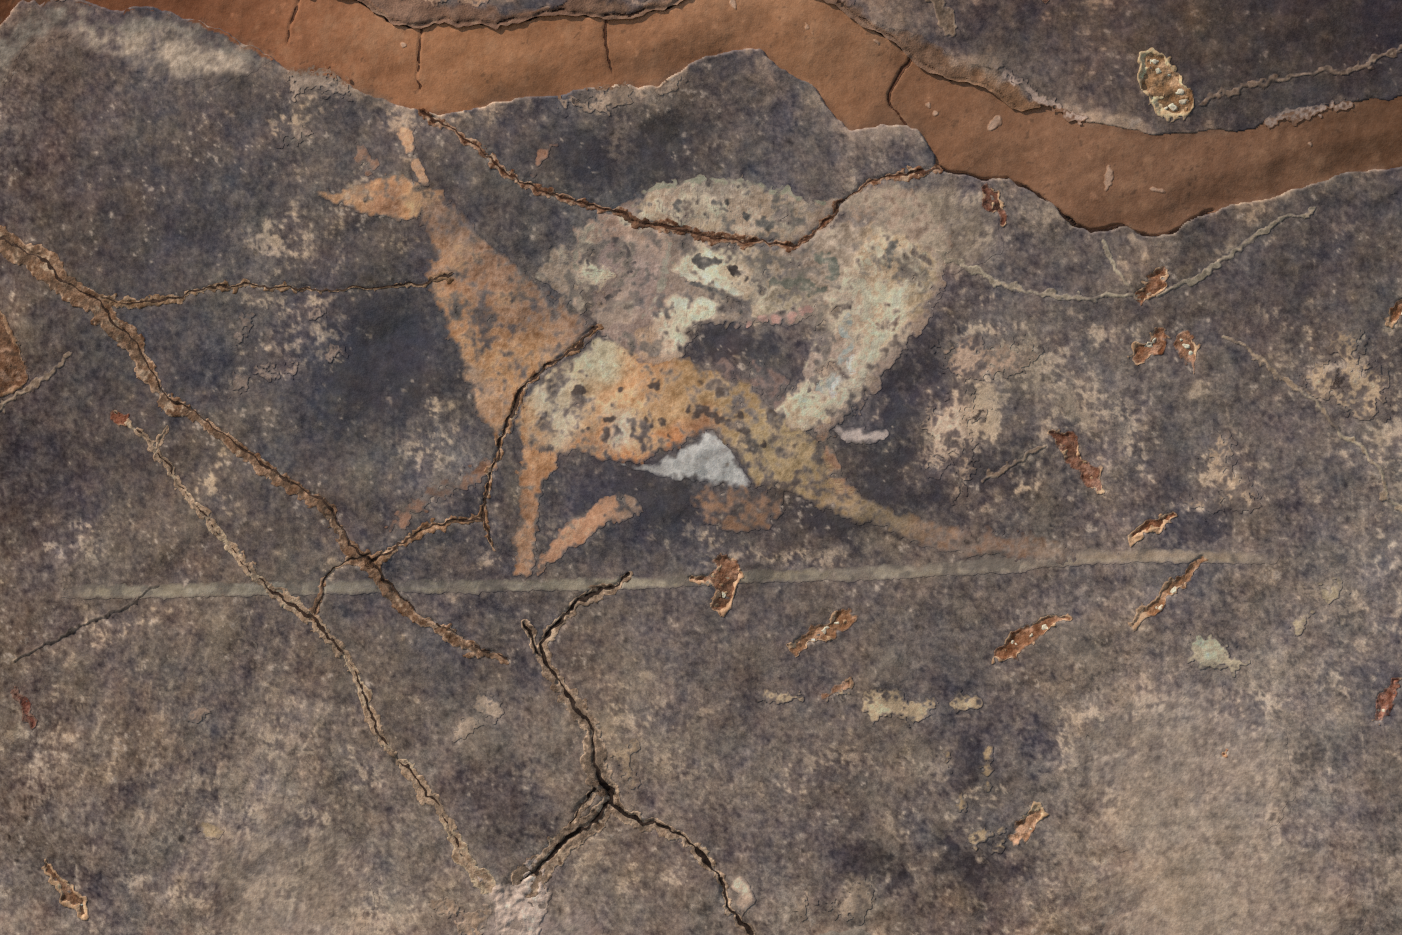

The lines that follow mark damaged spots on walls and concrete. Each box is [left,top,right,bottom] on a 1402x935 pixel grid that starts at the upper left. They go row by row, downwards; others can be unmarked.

peeling [275,62,352,148]
peeling [557,81,633,118]
peeling [991,63,1088,125]
spalling [1137,47,1194,123]
peeling [1264,98,1359,129]
spalling [981,183,1008,227]
crack [0,225,756,935]